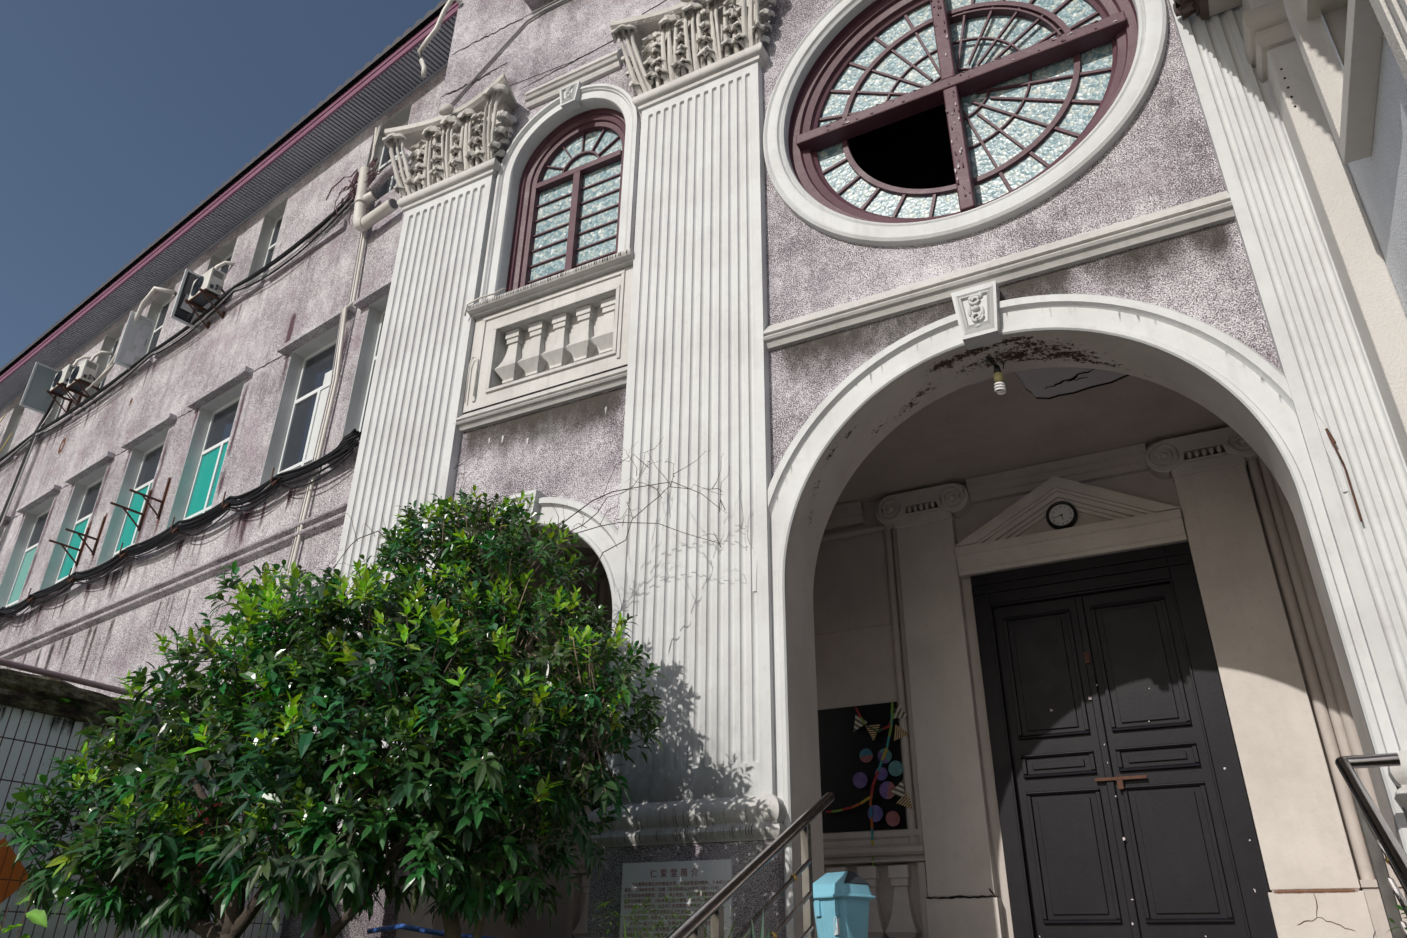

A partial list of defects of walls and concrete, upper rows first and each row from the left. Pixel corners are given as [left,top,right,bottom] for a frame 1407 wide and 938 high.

crack [1298,895,1376,938]